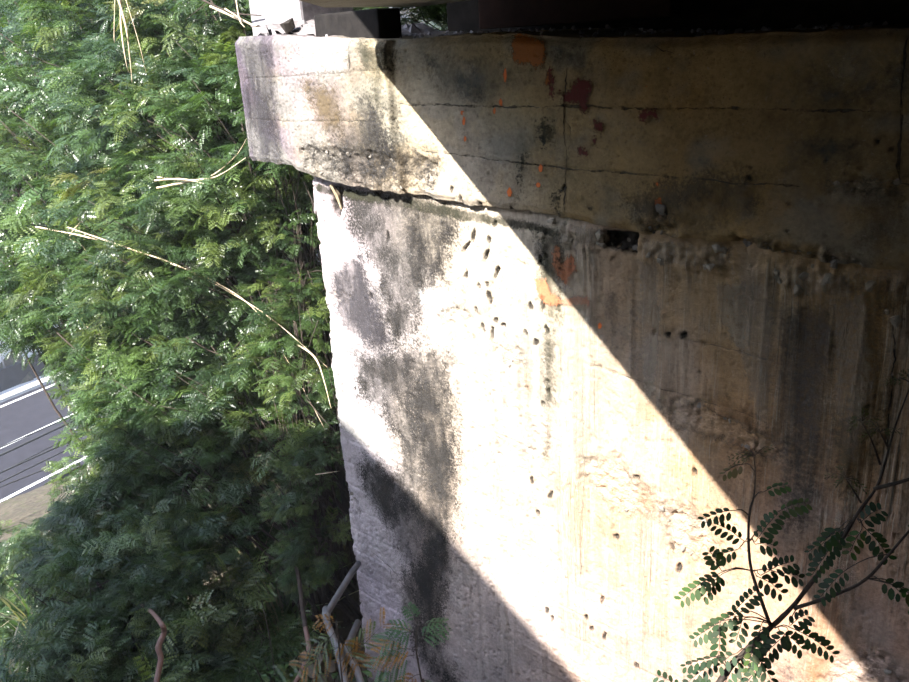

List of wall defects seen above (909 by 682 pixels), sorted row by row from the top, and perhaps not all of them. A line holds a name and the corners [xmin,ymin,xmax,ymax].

crack [563,69,571,213]
crack [880,37,909,189]
spalling [604,204,678,253]
damp [308,39,564,682]